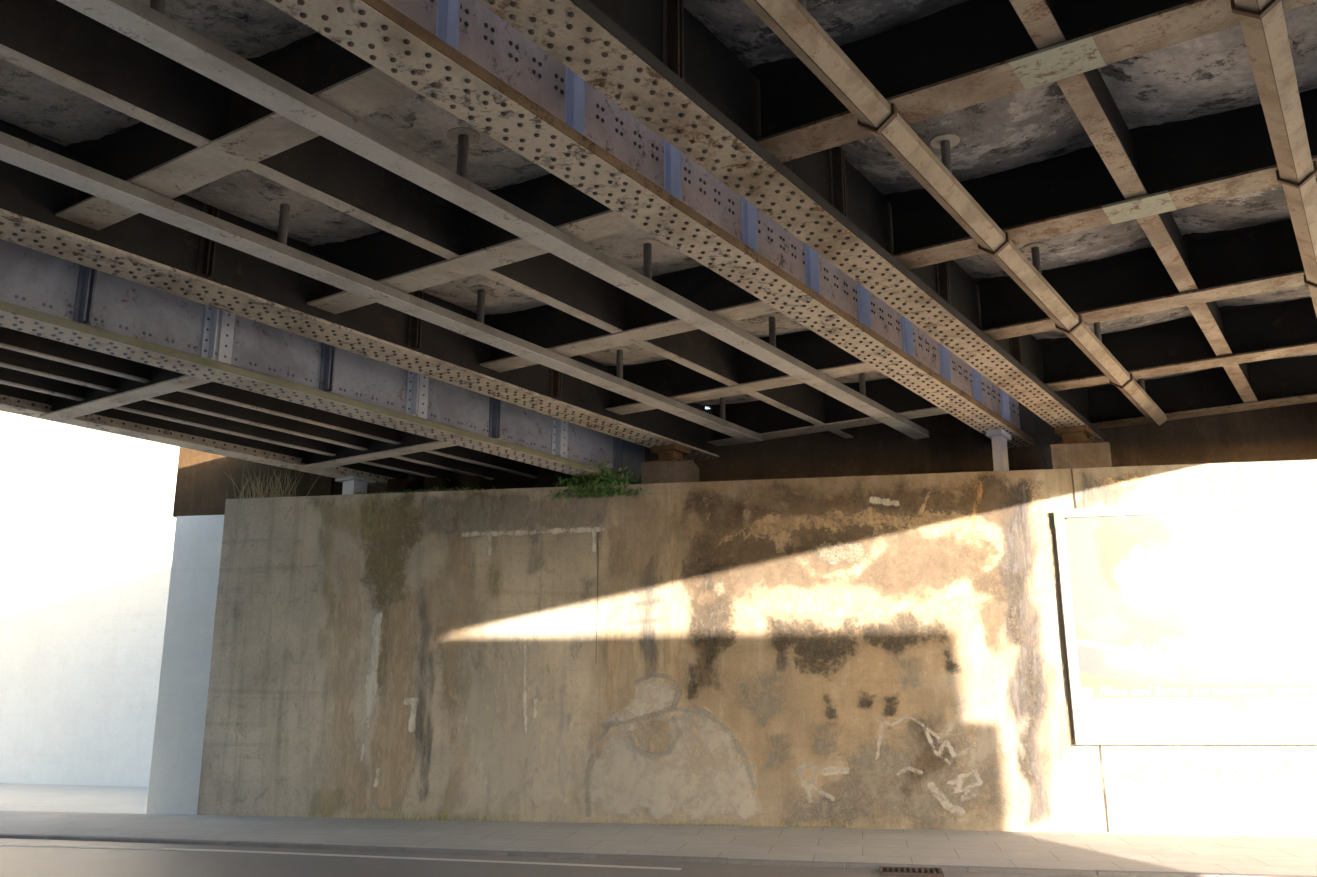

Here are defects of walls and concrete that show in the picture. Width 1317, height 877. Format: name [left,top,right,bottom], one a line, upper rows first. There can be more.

damp [360,489,608,797]
damp [690,481,1070,822]